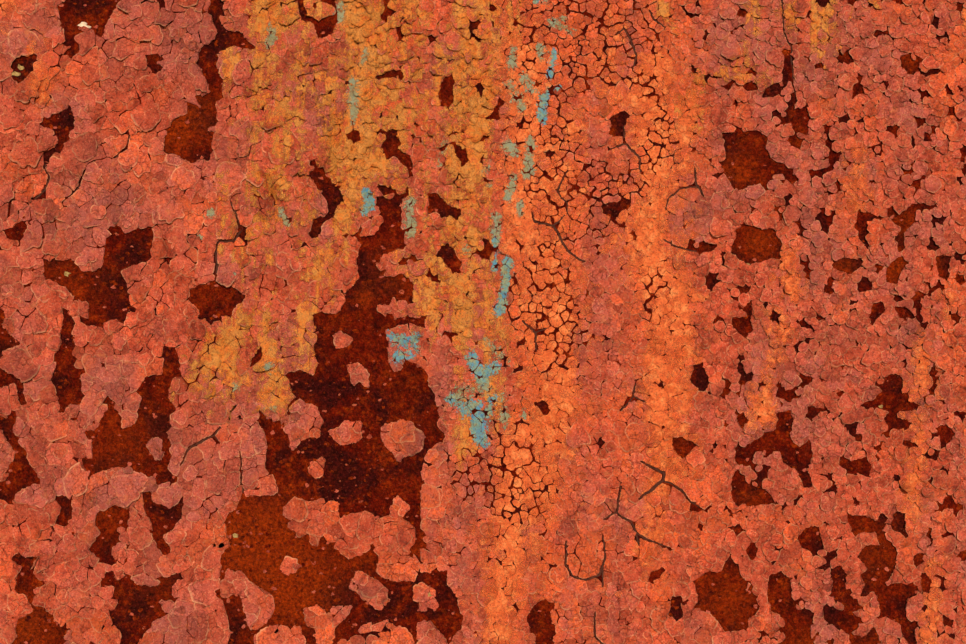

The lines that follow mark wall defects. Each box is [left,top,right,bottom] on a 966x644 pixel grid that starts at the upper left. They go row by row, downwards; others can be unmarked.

corrosion [21,37,52,104]
crack [616,28,637,68]
crack [532,171,585,262]
crack [613,126,641,173]
crack [665,168,704,210]
corrosion [183,0,591,644]
crack [522,321,549,351]
corrosion [578,0,842,581]
crack [621,383,645,411]
corrosion [896,330,943,524]
crack [565,461,700,586]
corrosion [918,557,943,644]